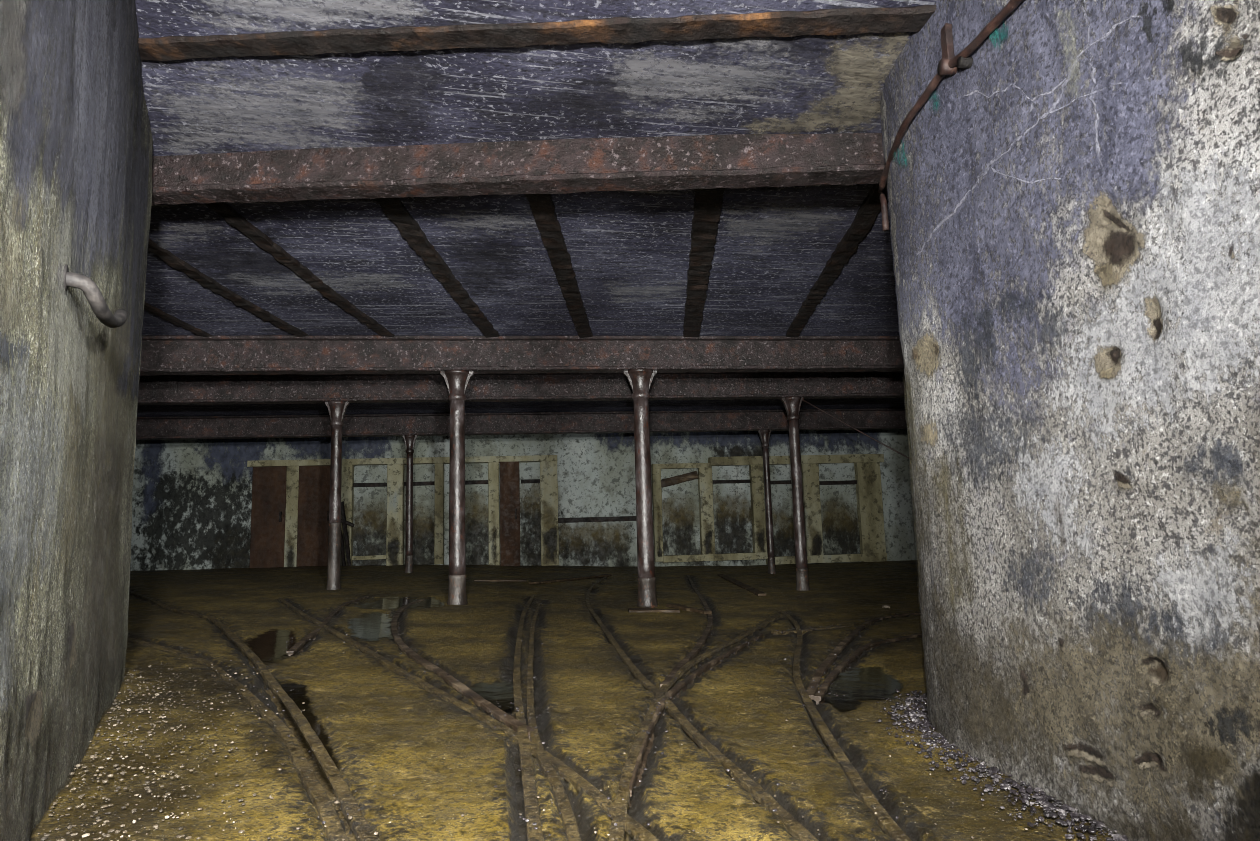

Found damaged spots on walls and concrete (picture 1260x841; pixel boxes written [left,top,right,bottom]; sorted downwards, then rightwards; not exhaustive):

water stain [0,0,57,367]
water stain [61,0,223,401]
water stain [436,212,536,235]
water stain [723,203,843,252]
spalling [1082,191,1146,289]
water stain [232,272,415,295]
water stain [604,280,686,303]
spalling [1144,295,1163,341]
spalling [1092,346,1122,379]
water stain [131,440,253,571]
water stain [1189,698,1260,797]
water stain [1222,768,1260,841]